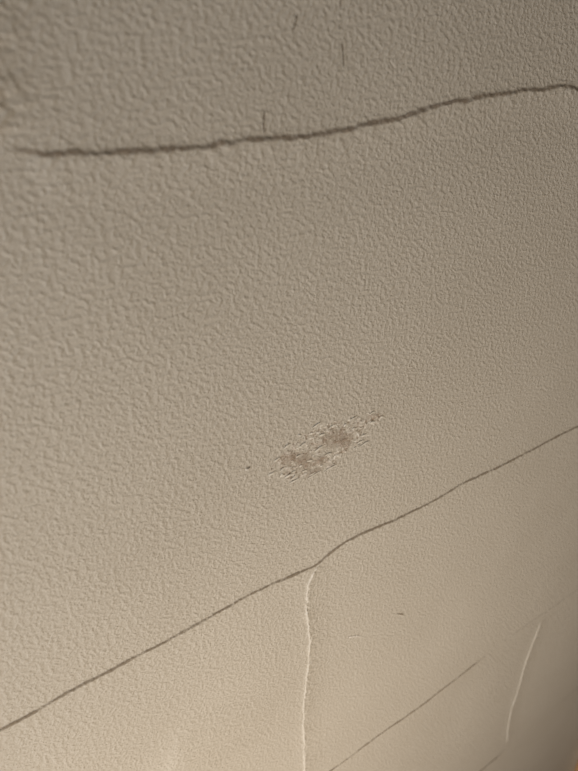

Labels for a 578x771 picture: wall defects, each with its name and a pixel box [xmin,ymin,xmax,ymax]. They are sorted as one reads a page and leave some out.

crack [19,79,578,207]
crack [0,424,578,771]